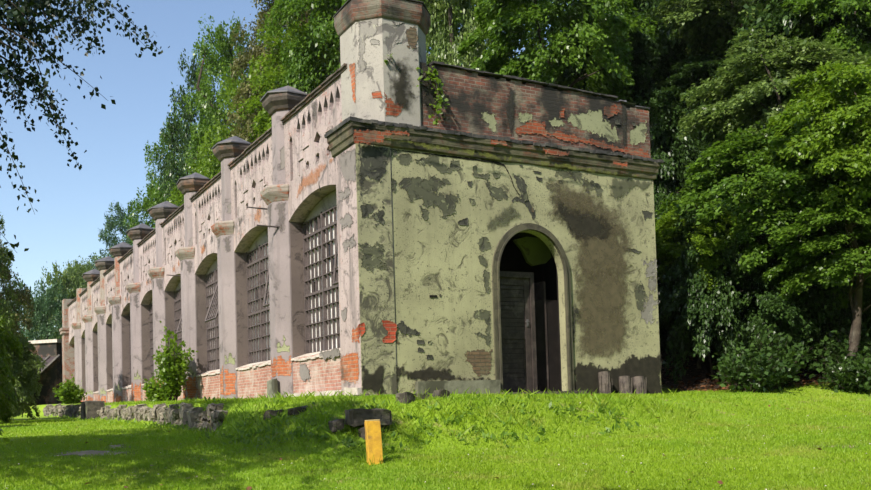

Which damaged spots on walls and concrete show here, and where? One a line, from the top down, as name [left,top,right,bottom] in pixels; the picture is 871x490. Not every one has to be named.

flaking render [372,91,403,117]
leakage [391,62,455,121]
peeling [481,112,507,146]
flaking render [515,104,650,168]
leakage [536,161,662,394]
flaking render [220,353,236,396]
flaking render [271,335,310,381]
flaking render [319,322,365,384]
leakage [361,362,385,394]
flaking render [382,320,434,360]
leakage [396,365,491,385]
flaking render [465,309,493,376]